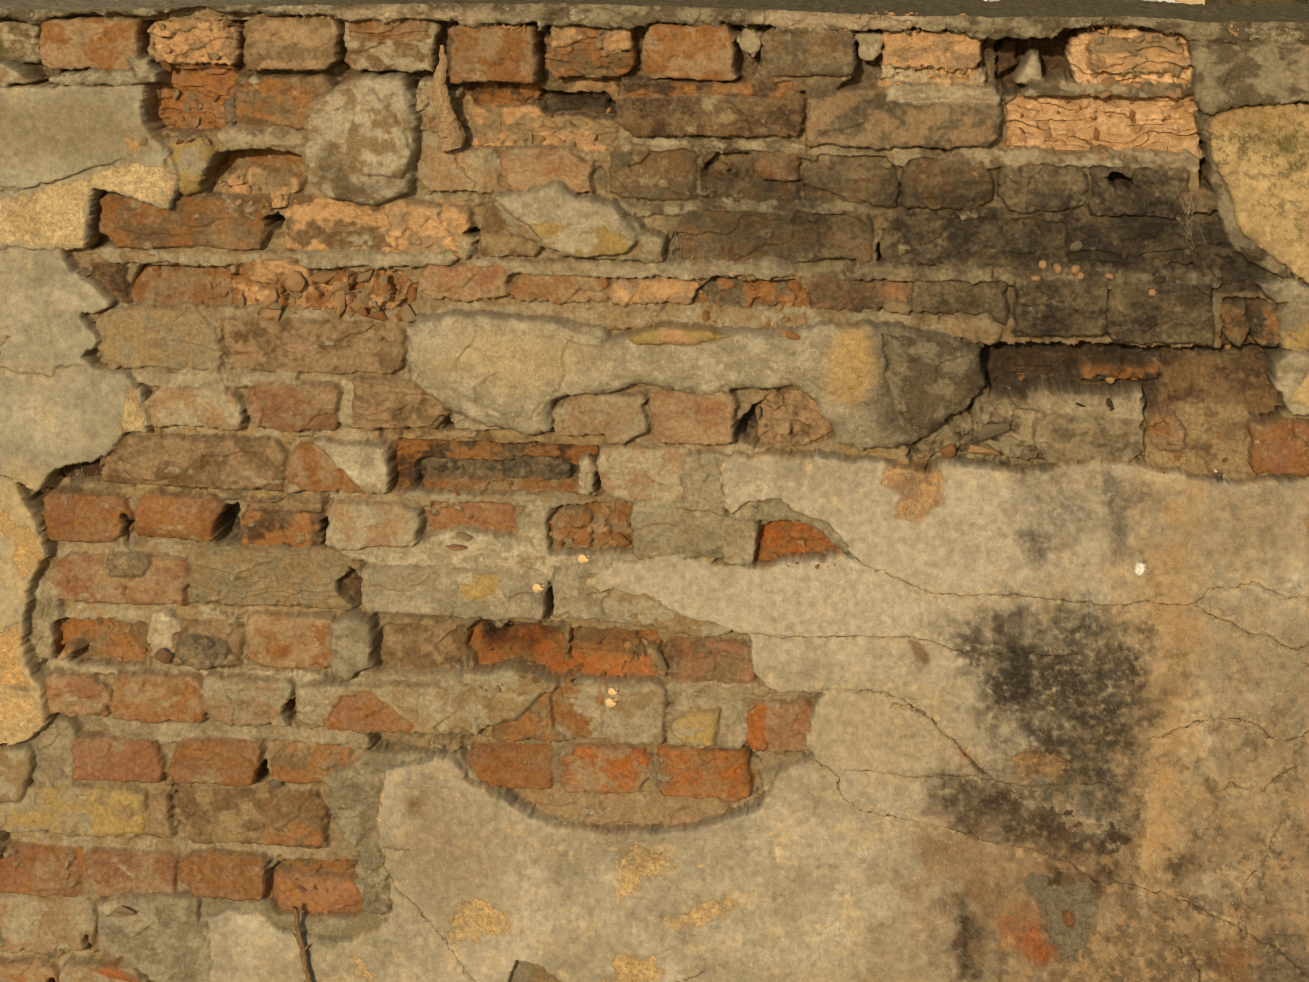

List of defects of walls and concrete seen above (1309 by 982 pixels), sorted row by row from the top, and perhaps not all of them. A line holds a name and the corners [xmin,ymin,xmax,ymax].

peeling [0,17,308,248]
spalling [456,78,620,152]
spalling [1005,25,1202,159]
spalling [132,260,419,323]
spalling [980,340,1285,482]
spalling [393,437,633,551]
spalling [57,618,172,669]
spalling [468,620,664,693]
crack [814,689,1113,817]
water stain [933,607,1146,874]
crack [1150,718,1309,792]
spalling [268,854,362,914]